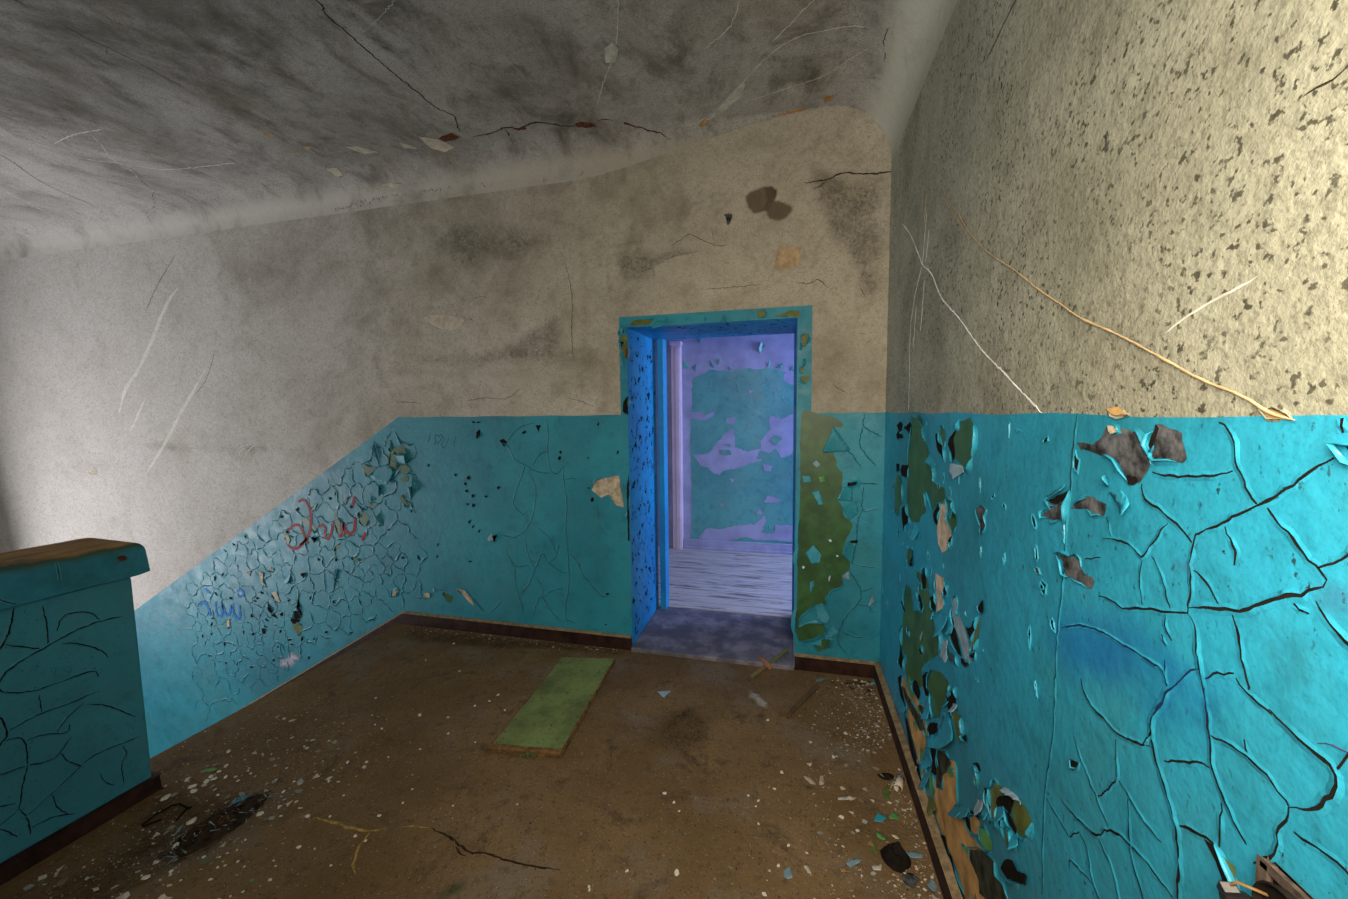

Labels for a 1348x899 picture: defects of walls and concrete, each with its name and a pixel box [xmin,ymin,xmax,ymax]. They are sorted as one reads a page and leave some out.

crack [316,0,894,140]
leakage [746,187,791,220]
crack [903,224,1042,413]
crack [0,563,140,839]
peeling [202,567,330,669]
crack [185,402,428,721]
peeling [280,433,430,606]
peeling [454,473,501,543]
peeling [587,309,862,653]
peeling [840,416,1034,899]
crack [1041,413,1348,899]
peeling [1326,442,1348,465]